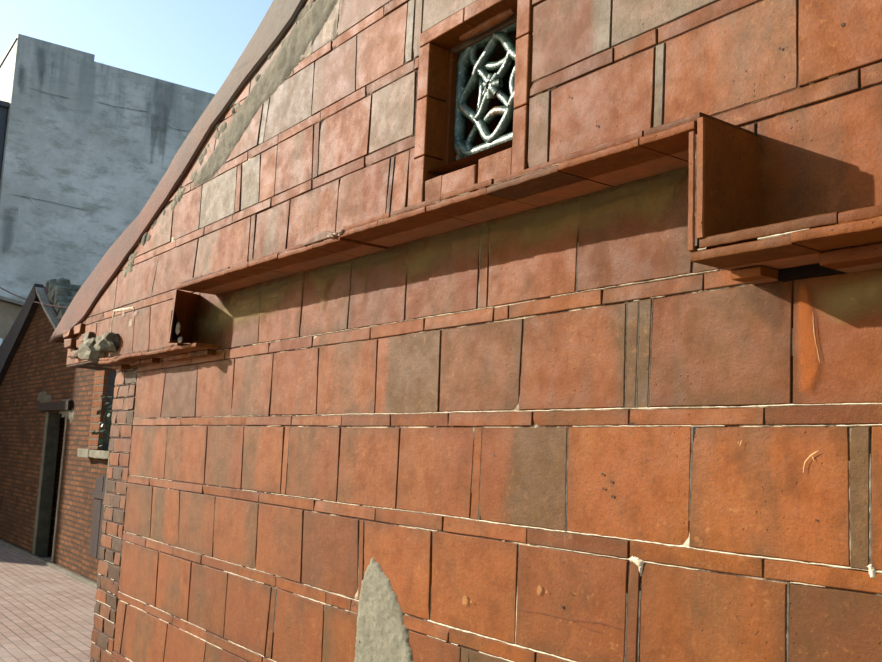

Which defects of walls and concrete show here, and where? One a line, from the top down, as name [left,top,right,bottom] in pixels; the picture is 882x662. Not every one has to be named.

peeling [123,0,338,278]